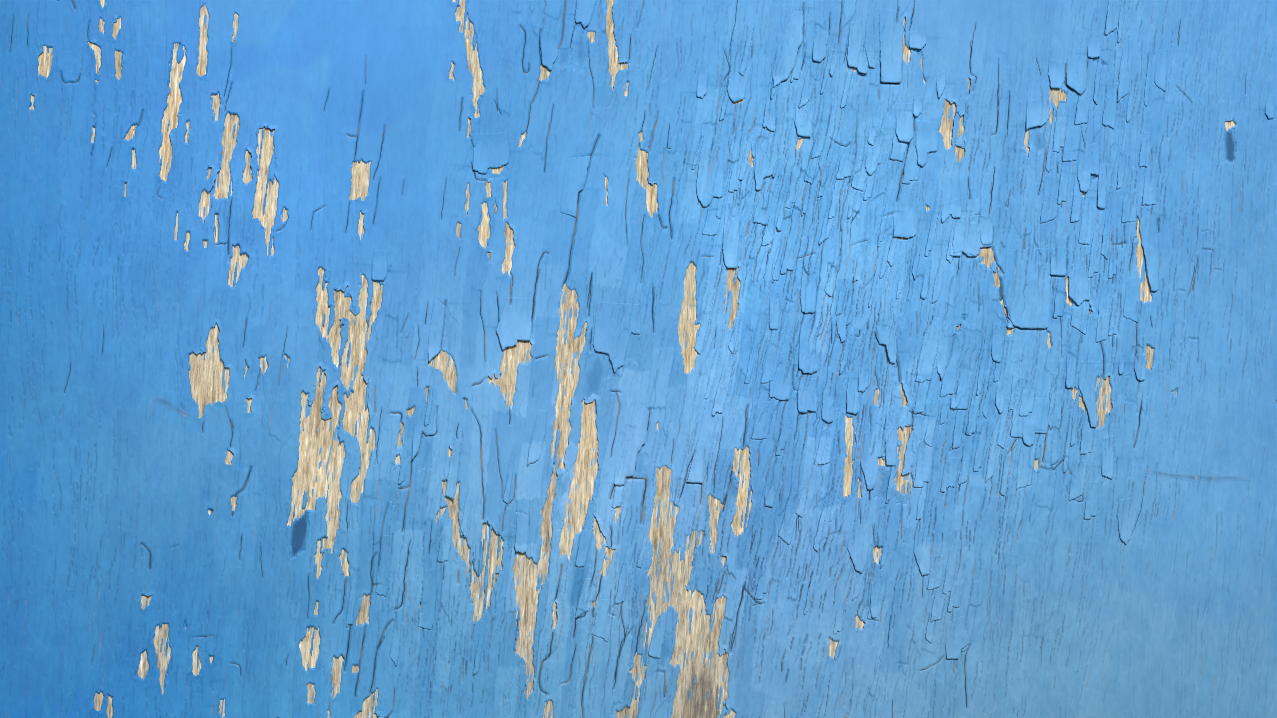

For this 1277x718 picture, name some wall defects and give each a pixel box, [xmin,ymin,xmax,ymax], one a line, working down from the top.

peeling [154,4,209,182]
peeling [174,93,288,257]
peeling [287,250,387,579]
crack [307,136,599,718]
crack [496,0,594,172]
peeling [435,283,808,718]
crack [625,180,674,333]
crack [539,391,765,714]
peeling [675,8,980,576]
crack [831,324,900,430]
crack [965,25,1010,138]
peeling [921,0,1134,490]